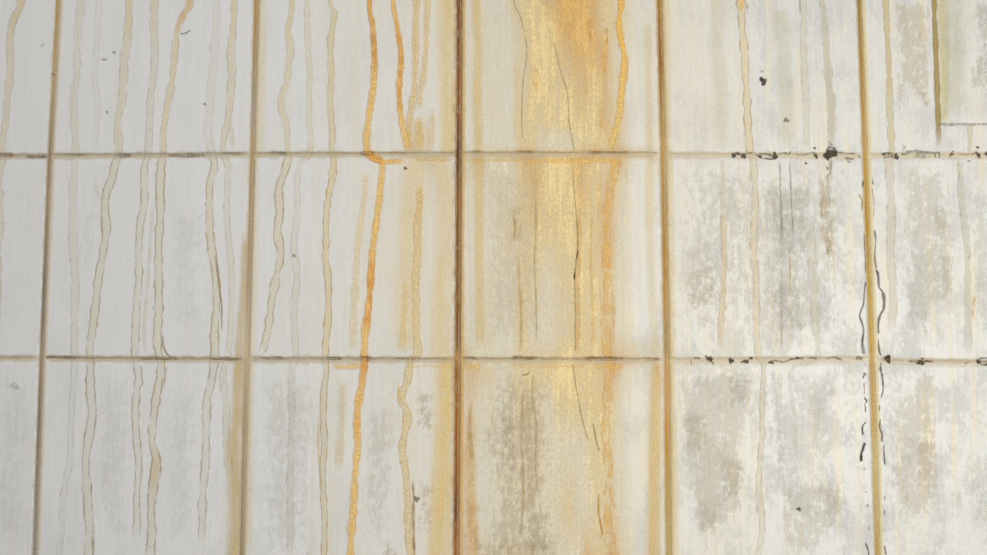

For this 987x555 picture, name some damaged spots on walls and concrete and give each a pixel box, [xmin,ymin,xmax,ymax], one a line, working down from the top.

leakage [732,0,787,176]
leakage [805,106,854,168]
leakage [132,52,176,550]
leakage [203,232,222,423]
leakage [320,156,337,415]
rust [338,0,429,555]
rust [418,0,629,555]
rust [644,0,676,555]
leakage [729,226,816,364]
crack [859,231,885,464]